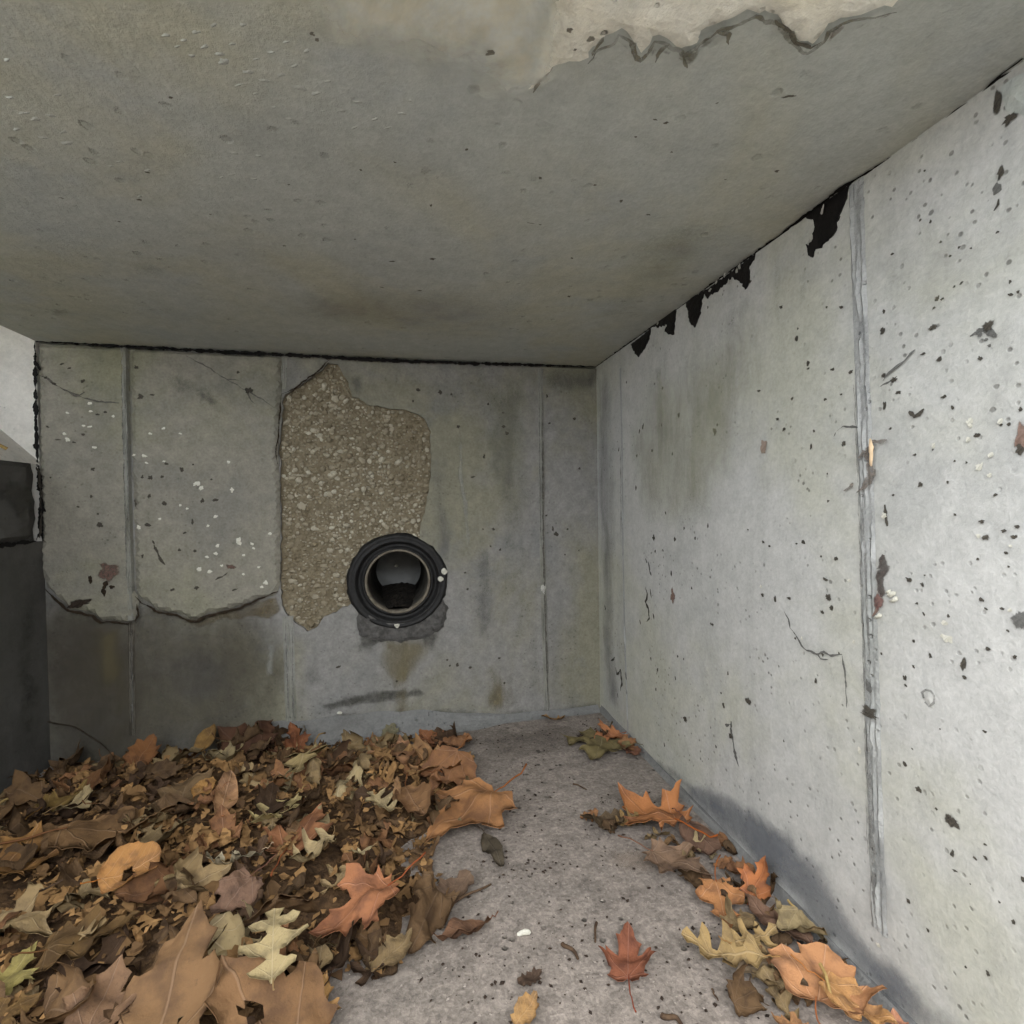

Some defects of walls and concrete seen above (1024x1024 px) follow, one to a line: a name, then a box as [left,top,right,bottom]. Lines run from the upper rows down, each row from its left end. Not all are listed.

crack [947,58,1024,117]
crack [0,138,917,548]
flaking render [39,344,431,631]
damp [329,692,404,707]
crack [785,614,847,708]